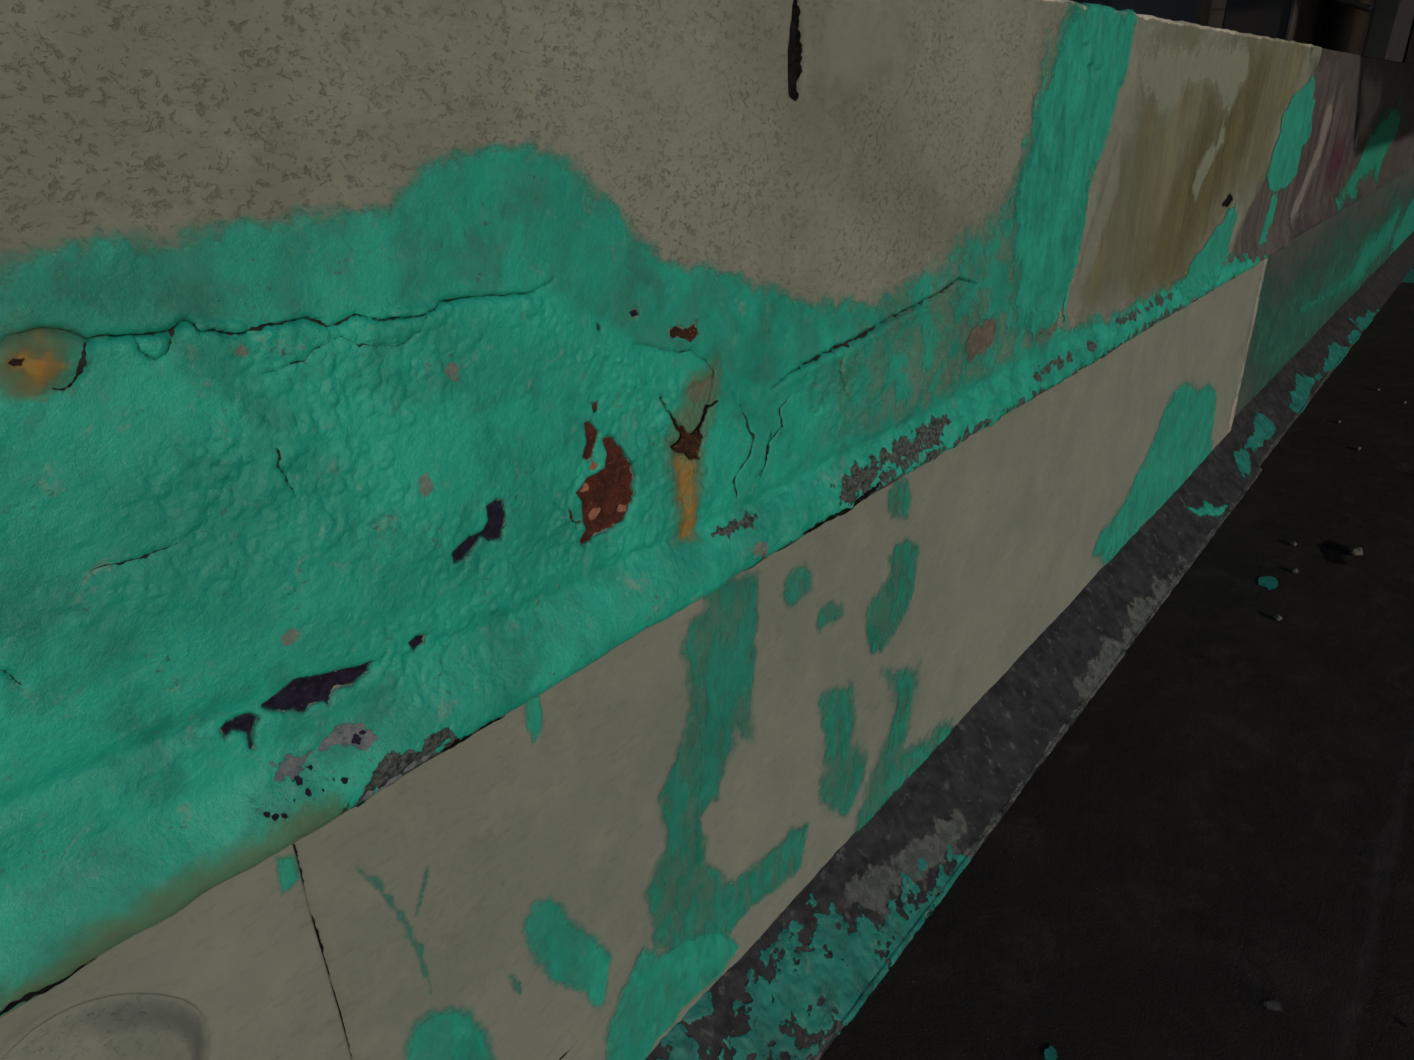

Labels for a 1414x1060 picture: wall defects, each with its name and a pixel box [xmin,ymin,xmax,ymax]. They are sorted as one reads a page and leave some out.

crack [788,0,803,101]
leakage [1087,28,1383,300]
crack [50,288,539,369]
crack [636,281,955,539]
peeling [830,287,1208,517]
rust [660,396,718,538]
peeling [452,499,506,564]
peeling [221,661,372,749]
peeling [263,723,461,821]